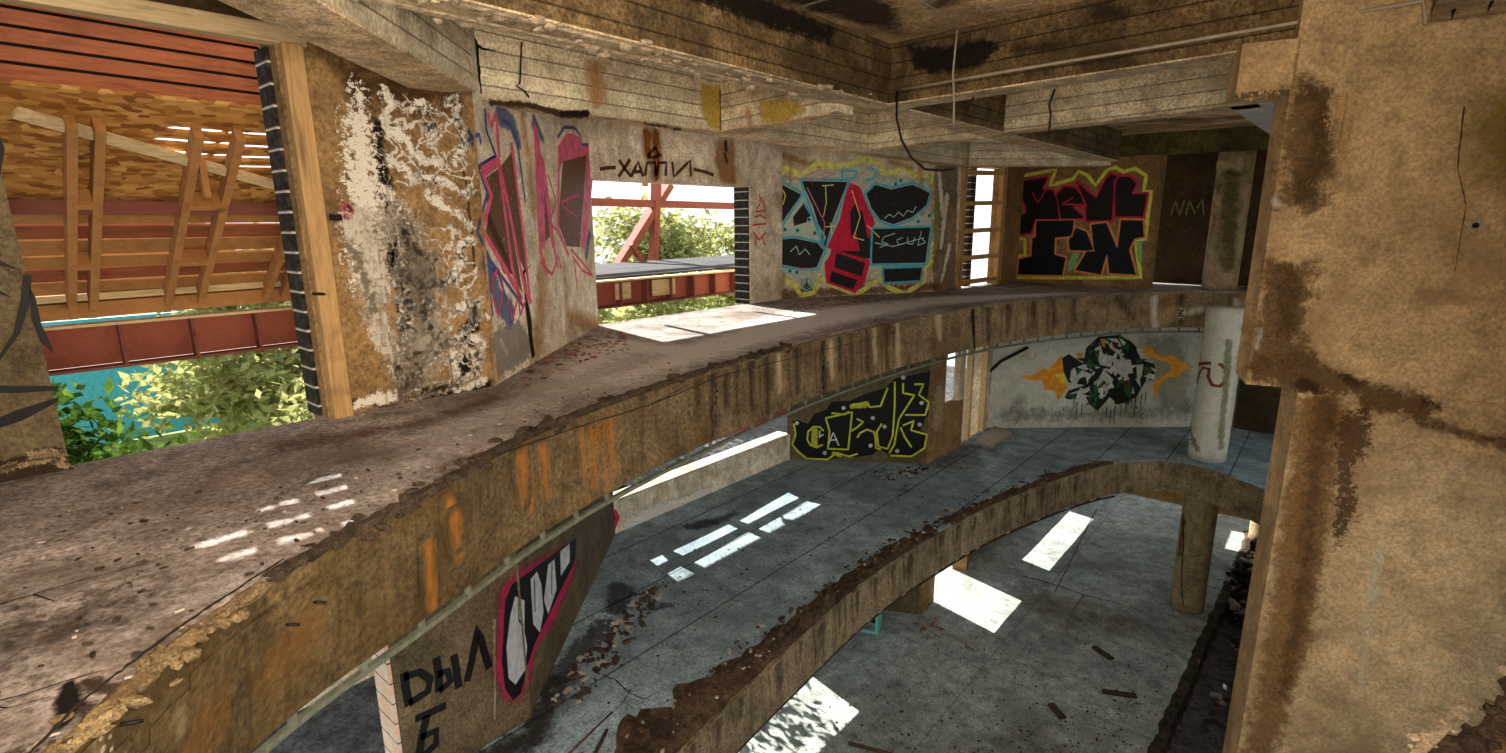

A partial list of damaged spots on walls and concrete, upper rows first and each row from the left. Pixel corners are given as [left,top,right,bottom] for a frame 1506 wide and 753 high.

damp [695,0,901,44]
damp [908,38,1054,74]
damp [1233,79,1376,216]
damp [334,64,493,411]
damp [982,298,1080,346]
damp [1111,293,1207,328]
spalling [41,341,793,753]
damp [1218,258,1506,753]
spalling [1406,661,1506,753]